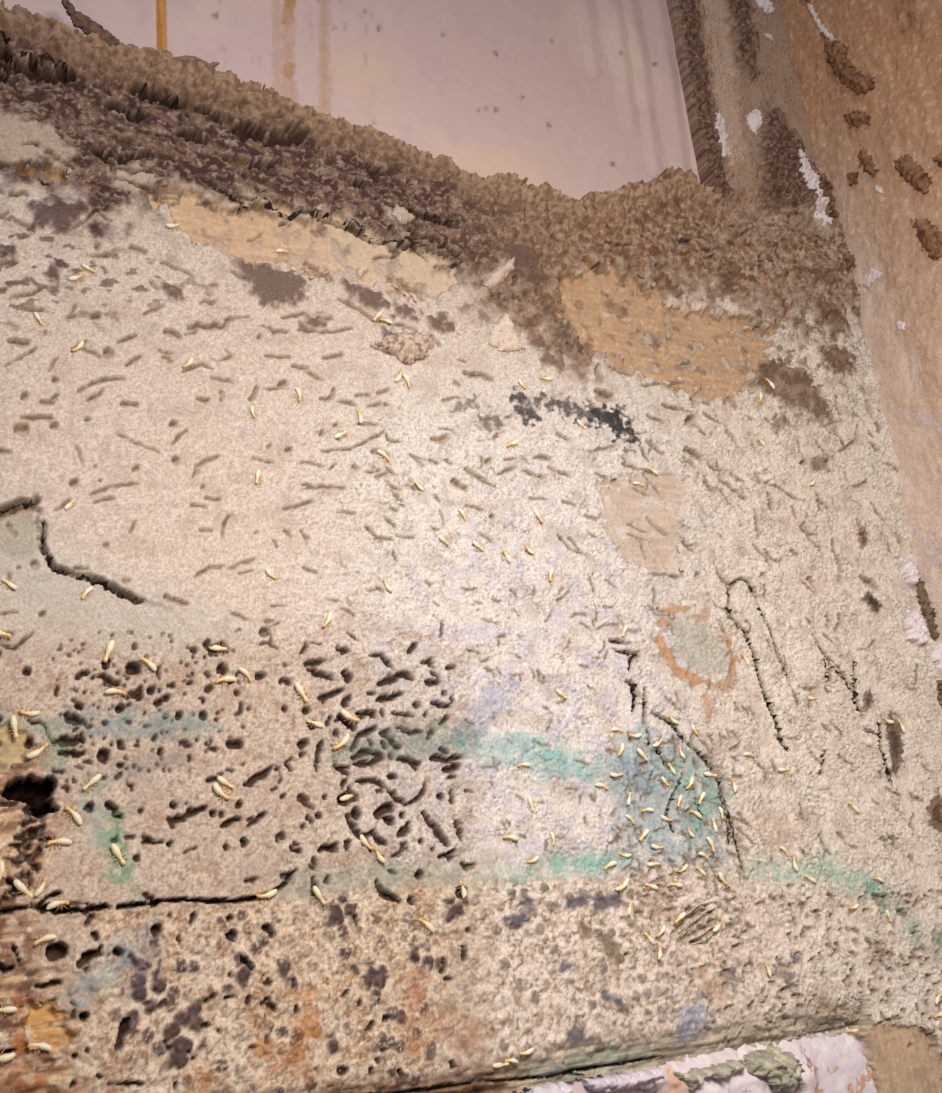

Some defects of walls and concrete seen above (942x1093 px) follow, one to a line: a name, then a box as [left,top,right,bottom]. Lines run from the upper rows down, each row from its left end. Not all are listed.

corrosion [157,0,167,50]
corrosion [284,0,295,23]
peeling [146,180,461,305]
peeling [555,260,779,405]
crack [0,499,143,604]
crack [725,579,789,752]
crack [0,871,293,914]
crack [395,1055,666,1093]
peeling [854,1023,942,1093]